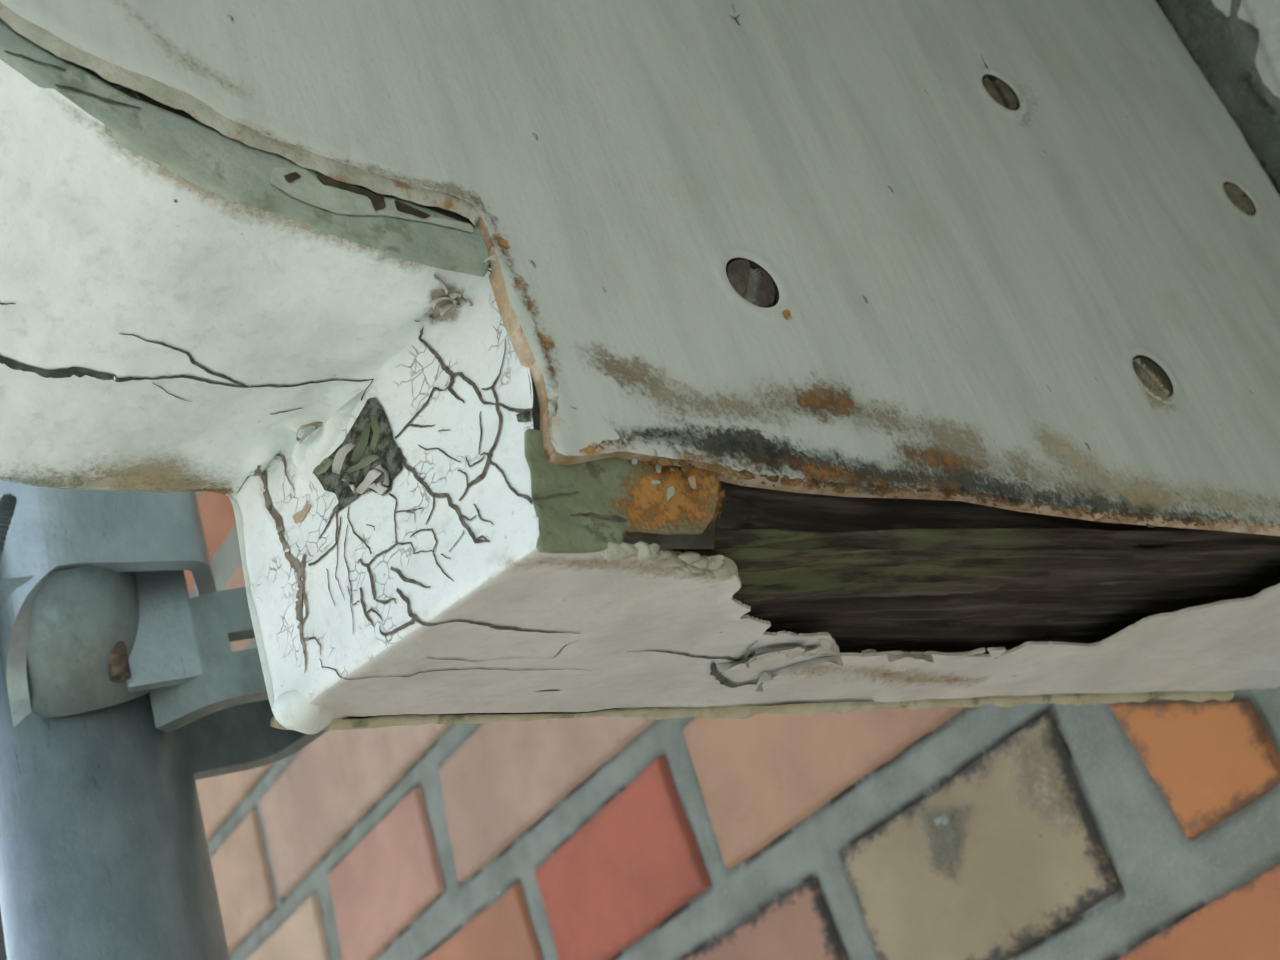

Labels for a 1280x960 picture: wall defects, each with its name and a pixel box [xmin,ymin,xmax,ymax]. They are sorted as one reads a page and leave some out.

peeling [1212,0,1280,99]
peeling [270,166,473,232]
peeling [419,274,473,329]
crack [0,333,374,415]
peeling [313,398,403,512]
corrosion [579,354,1218,533]
crack [234,320,627,680]
peeling [600,541,738,581]
peeling [709,638,843,692]
peeling [861,649,934,663]